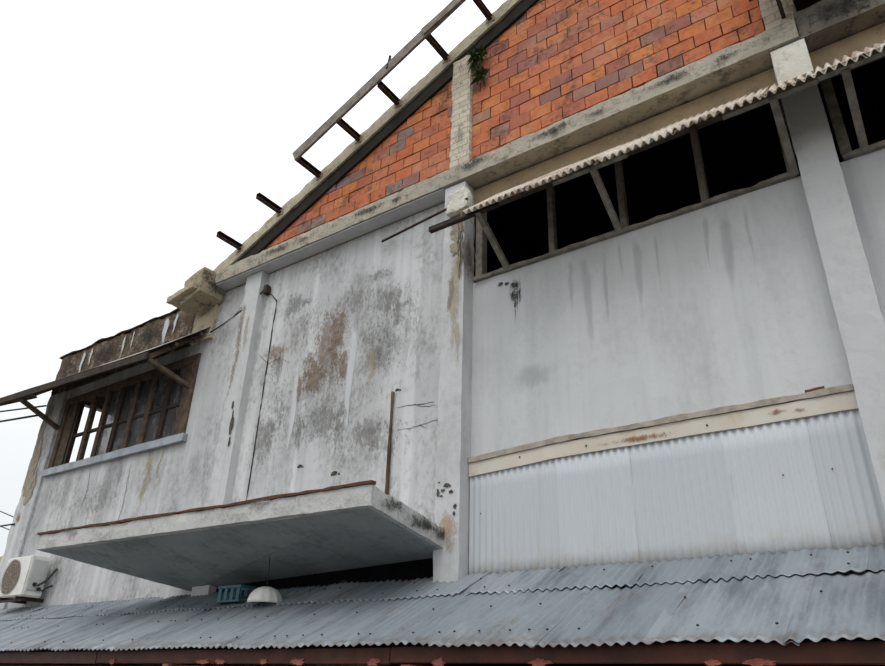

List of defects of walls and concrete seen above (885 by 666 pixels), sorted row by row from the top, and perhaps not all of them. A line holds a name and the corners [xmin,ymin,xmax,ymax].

damp [287,281,411,449]
damp [498,280,522,312]